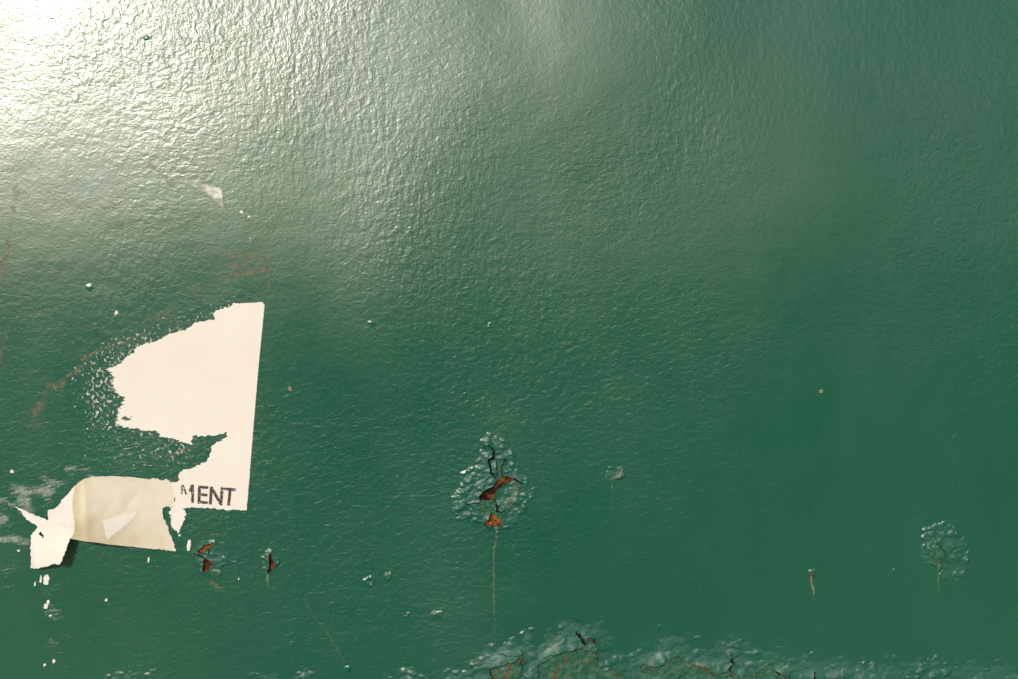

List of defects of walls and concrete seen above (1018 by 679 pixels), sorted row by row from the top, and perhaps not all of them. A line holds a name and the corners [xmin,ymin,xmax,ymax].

rust [451,432,536,537]
peeling [441,619,892,679]
peeling [101,669,159,679]
peeling [247,665,316,679]
peeling [382,666,429,679]